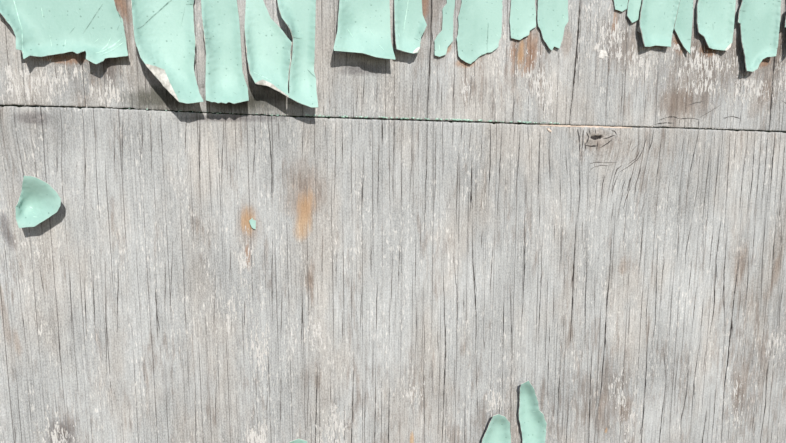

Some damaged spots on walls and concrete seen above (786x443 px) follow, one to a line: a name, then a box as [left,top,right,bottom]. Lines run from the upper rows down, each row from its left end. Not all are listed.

peeling [0,0,318,108]
peeling [333,0,427,60]
peeling [434,0,568,64]
peeling [613,0,786,72]
crack [114,126,123,171]
crack [142,78,163,171]
crack [185,126,200,177]
crack [253,121,279,185]
peeling [15,176,61,228]
crack [302,0,786,443]
crack [58,269,119,371]
peeling [482,380,547,443]